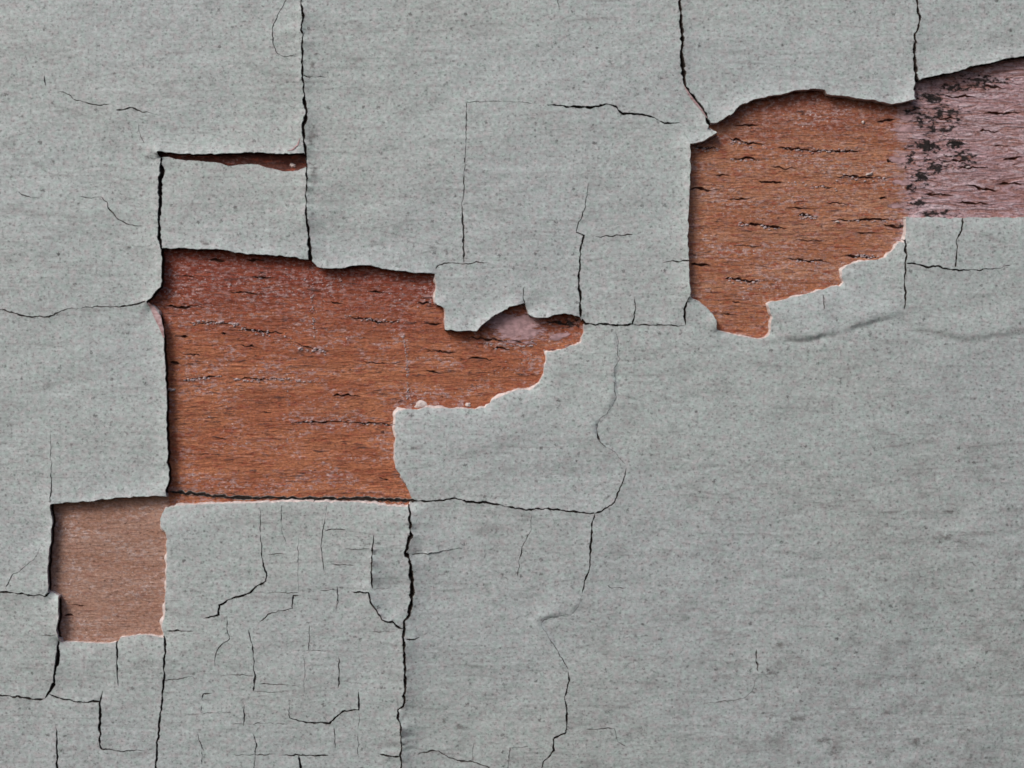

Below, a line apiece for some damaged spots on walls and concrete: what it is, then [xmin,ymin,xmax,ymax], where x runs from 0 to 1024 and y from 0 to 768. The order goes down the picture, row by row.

peeling [47,138,584,644]
crack [0,183,690,768]
crack [435,0,711,269]
peeling [684,56,1024,339]
crack [912,0,922,90]
crack [904,218,1010,309]
mould [903,72,1013,218]